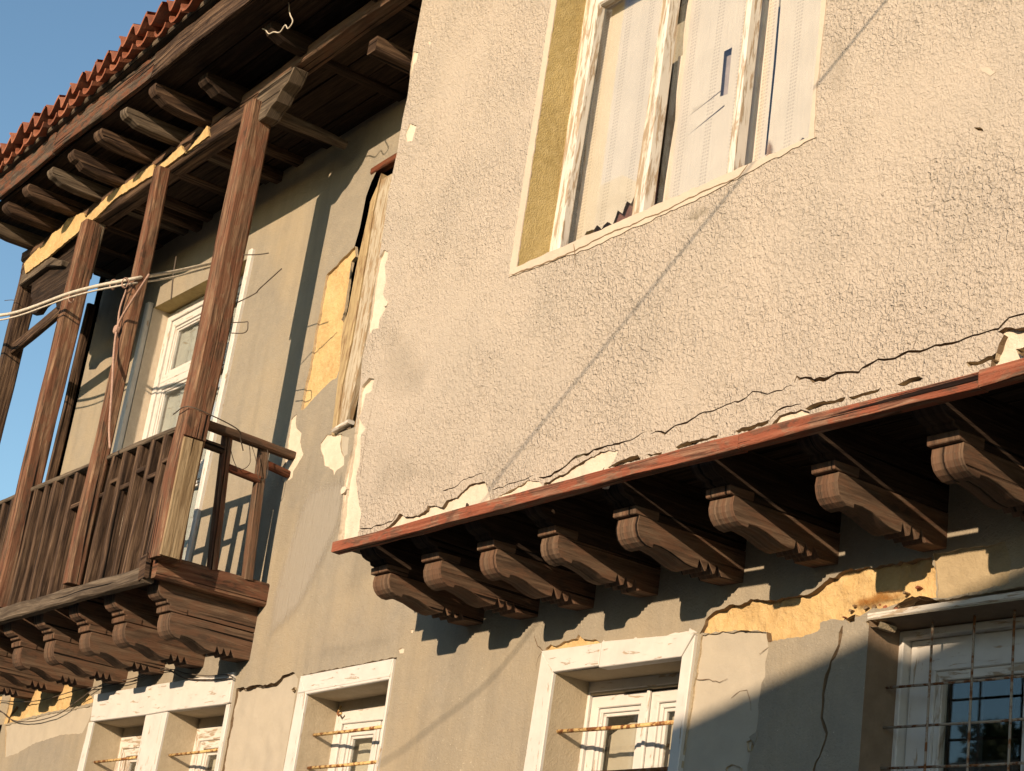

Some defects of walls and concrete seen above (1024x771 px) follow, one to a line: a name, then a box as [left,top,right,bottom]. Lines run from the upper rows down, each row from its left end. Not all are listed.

flaking render [282,246,358,482]
flaking render [320,378,374,541]
flaking render [369,250,388,335]
crack [443,313,1024,491]
crack [237,672,295,691]
crack [813,626,843,771]
flaking render [681,541,1024,771]